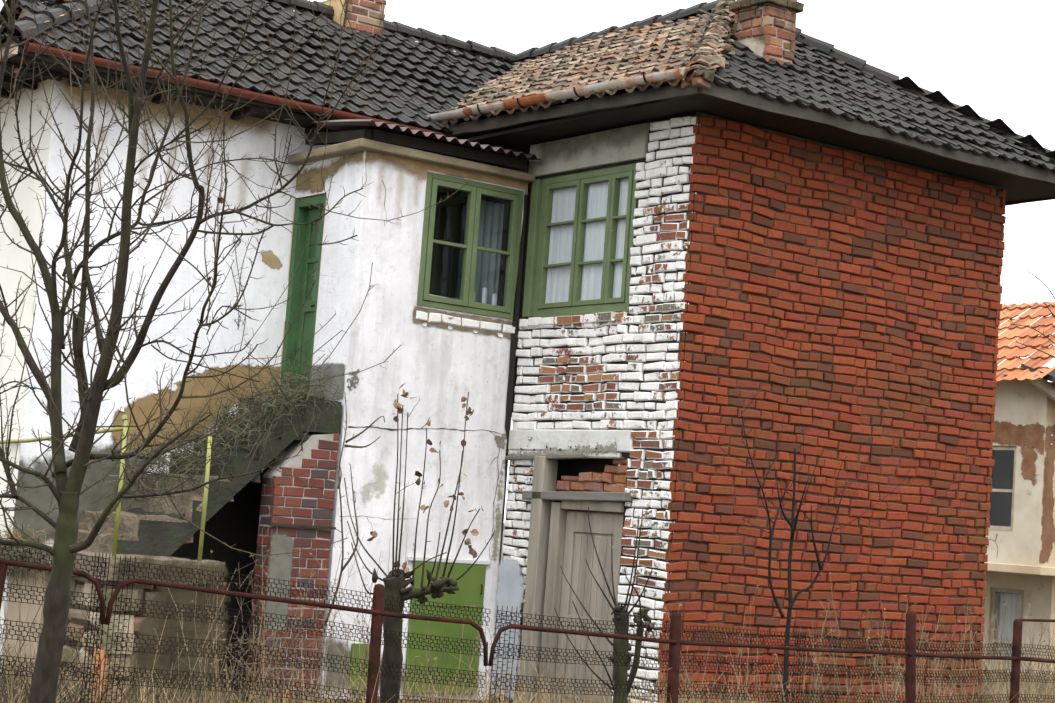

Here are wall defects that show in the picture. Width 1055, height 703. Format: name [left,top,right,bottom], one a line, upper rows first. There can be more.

peeling [261,250,282,269]
peeling [555,316,582,335]
peeling [538,349,624,418]
peeling [594,202,688,339]
peeling [509,422,671,597]
peeling [993,421,1055,563]